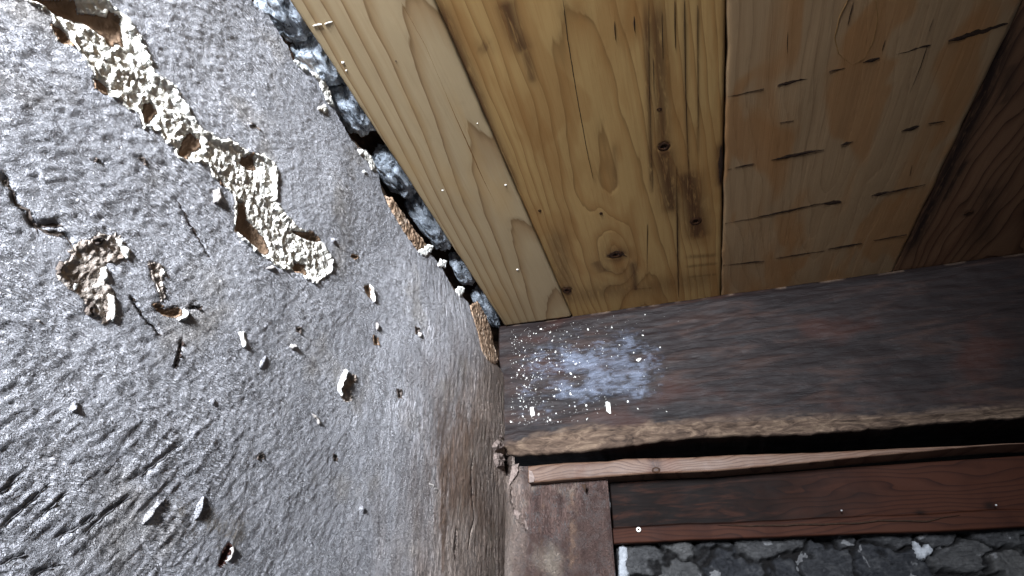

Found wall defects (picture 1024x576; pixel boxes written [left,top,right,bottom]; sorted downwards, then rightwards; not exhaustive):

spalling [25,0,335,285]
crack [2,170,74,250]
spalling [55,232,132,325]
spalling [148,262,203,321]
spalling [338,369,357,402]